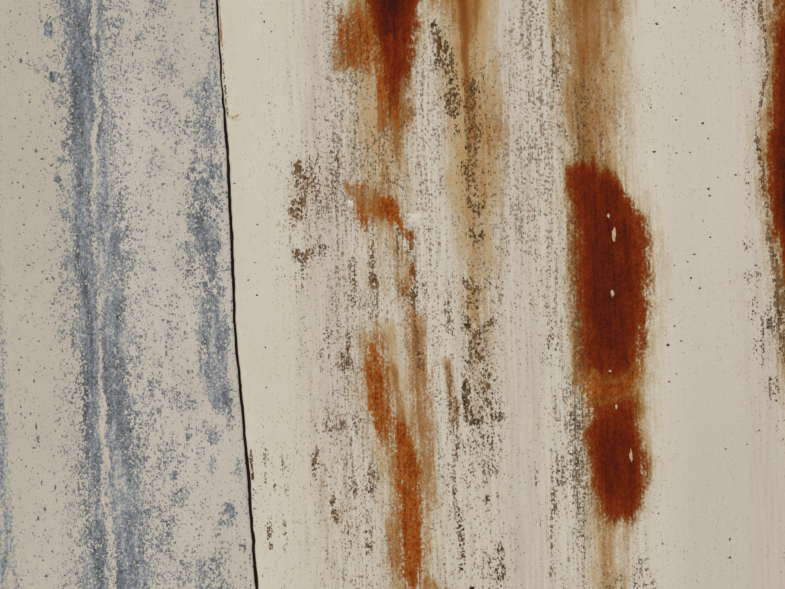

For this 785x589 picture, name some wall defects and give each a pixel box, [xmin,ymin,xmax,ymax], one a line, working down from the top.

corrosion [288,0,509,589]
corrosion [547,0,654,528]
corrosion [754,0,785,373]